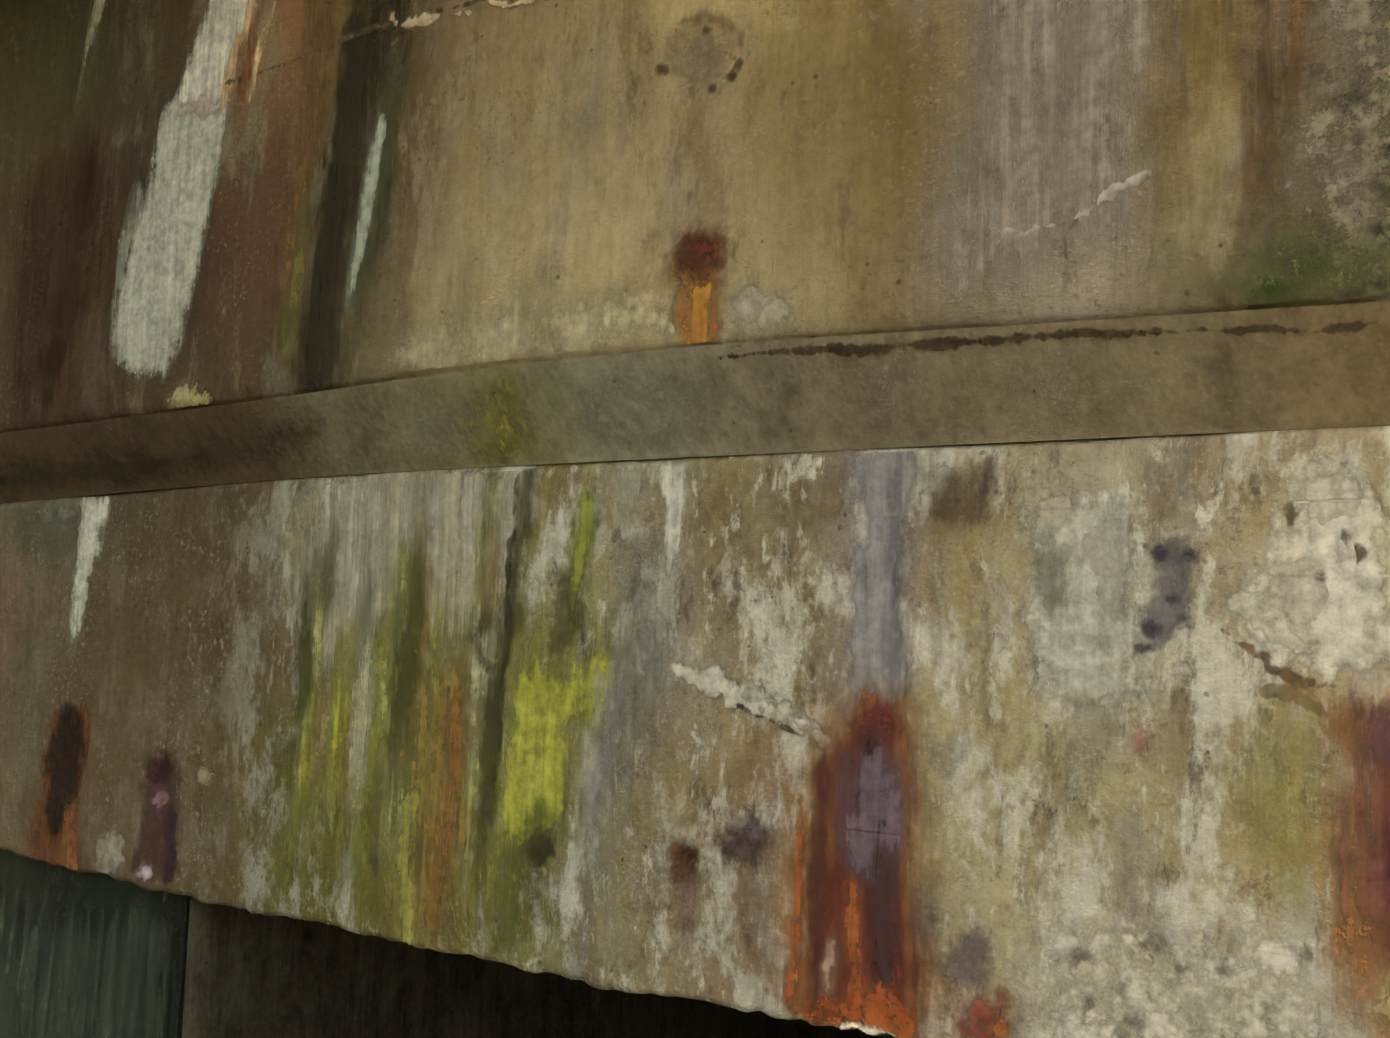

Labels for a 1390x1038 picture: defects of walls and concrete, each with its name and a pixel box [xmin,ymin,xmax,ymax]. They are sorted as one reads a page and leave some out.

crack [225,0,536,85]
damp [112,0,268,408]
damp [275,0,409,391]
rust [672,232,725,344]
crack [989,169,1156,259]
damp [293,468,535,796]
damp [553,570,583,646]
rust [29,703,90,870]
rust [131,751,181,884]
rust [667,840,699,920]
rust [714,688,1014,1038]
rust [1326,700,1390,1035]